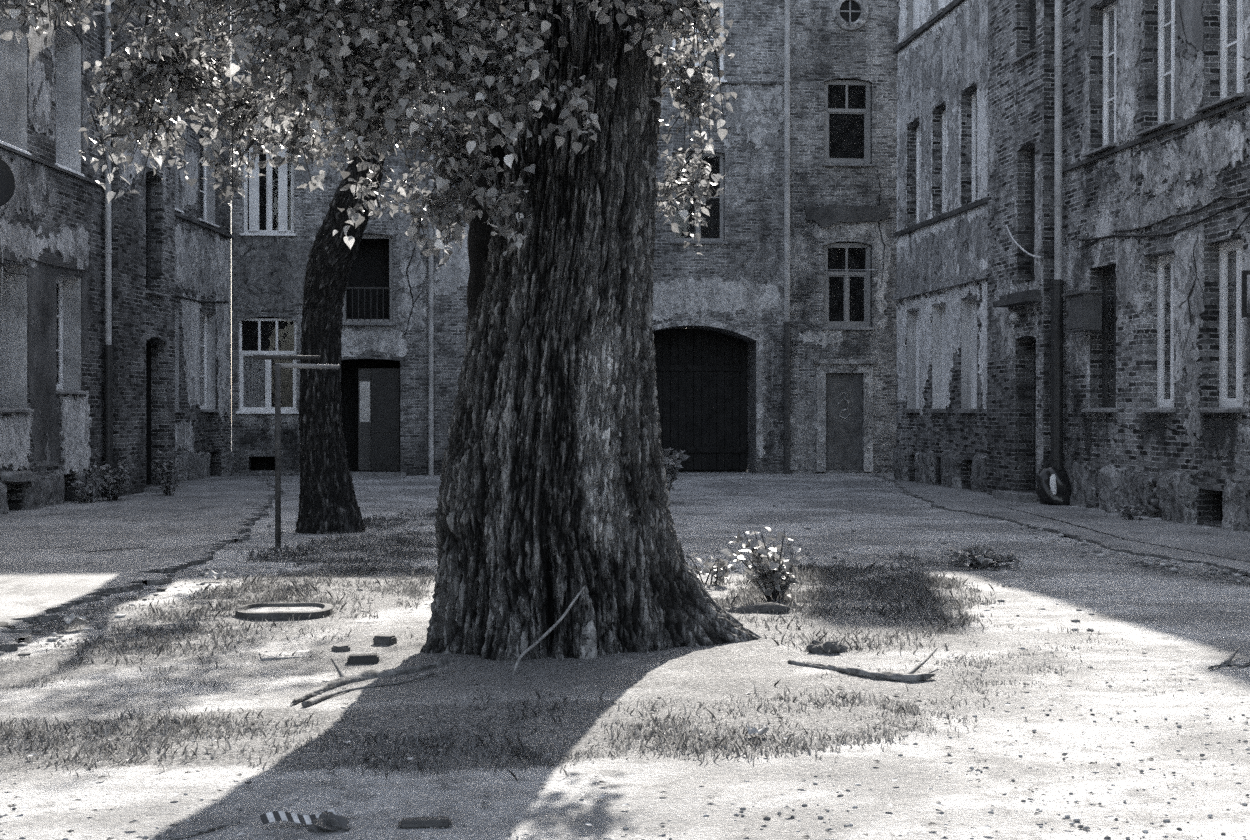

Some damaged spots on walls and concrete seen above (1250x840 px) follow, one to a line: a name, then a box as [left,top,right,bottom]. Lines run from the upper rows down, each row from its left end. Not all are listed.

flaking render [27,0,86,141]
flaking render [1077,0,1103,160]
flaking render [0,147,92,476]
flaking render [652,275,782,323]
flaking render [1081,0,1250,446]
flaking render [790,396,816,470]